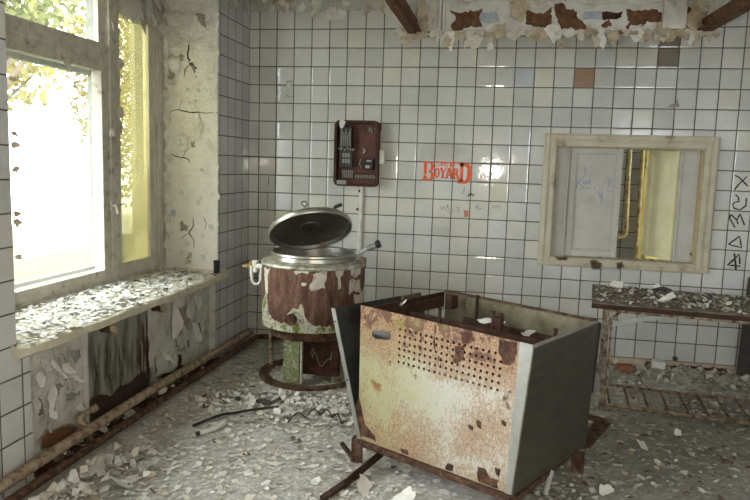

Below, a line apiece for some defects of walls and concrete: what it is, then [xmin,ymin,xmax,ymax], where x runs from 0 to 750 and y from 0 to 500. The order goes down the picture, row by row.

peeling [444,0,721,52]
peeling [31,290,208,433]
damp [89,352,185,422]
corrosion [40,424,78,449]